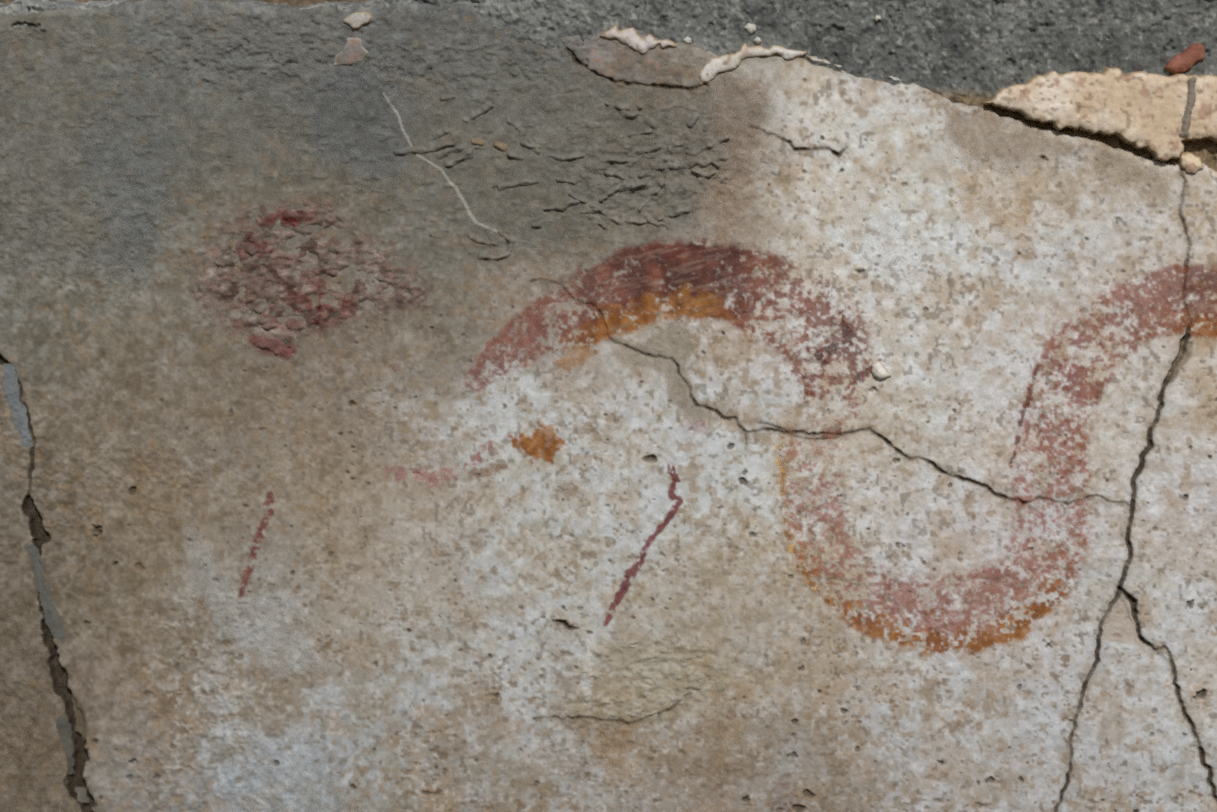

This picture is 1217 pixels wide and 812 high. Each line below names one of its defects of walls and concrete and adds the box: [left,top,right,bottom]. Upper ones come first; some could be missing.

spalling [586,26,807,86]
crack [883,77,1040,128]
crack [1179,77,1196,137]
crack [788,142,841,156]
crack [694,401,729,419]
crack [928,461,1024,504]
crack [1060,265,1217,802]
crack [0,354,97,812]